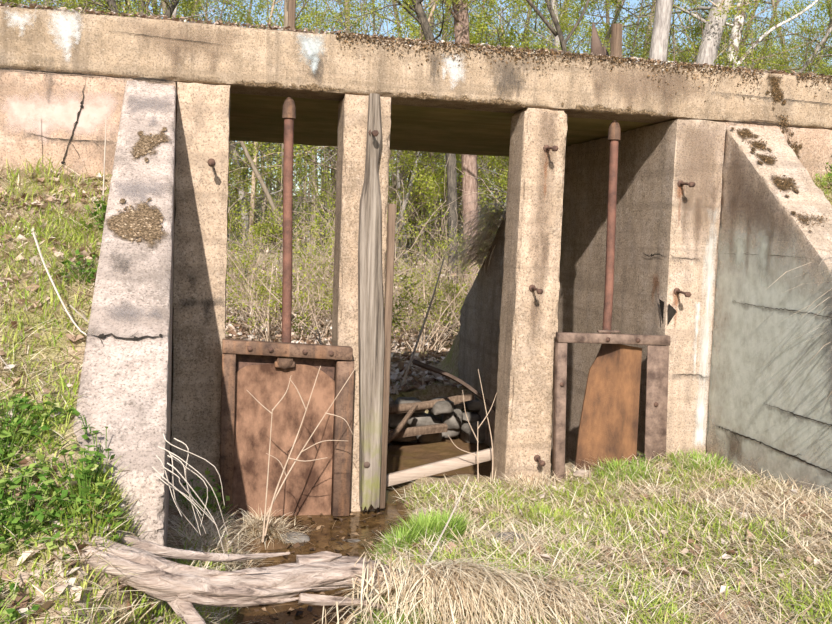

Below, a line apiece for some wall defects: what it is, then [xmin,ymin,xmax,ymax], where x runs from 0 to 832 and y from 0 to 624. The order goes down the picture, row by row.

leakage [53,14,78,58]
crack [1,68,172,168]
crack [734,300,832,318]
crack [86,332,163,346]
crack [766,404,831,425]
crack [715,425,832,474]